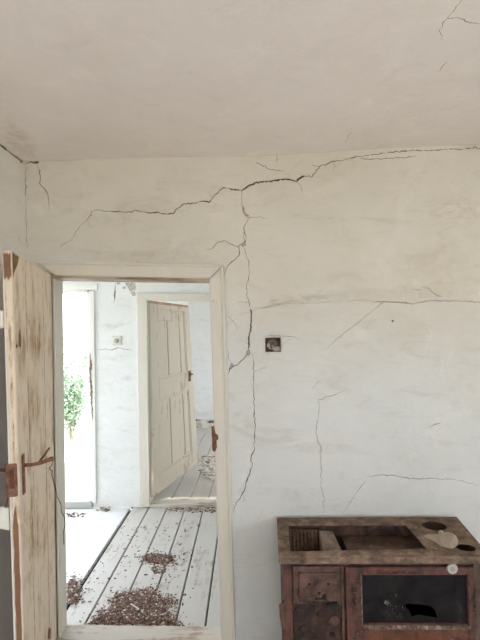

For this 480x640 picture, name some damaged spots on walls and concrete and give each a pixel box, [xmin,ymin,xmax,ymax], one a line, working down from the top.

crack [0,144,49,202]
crack [62,147,480,509]